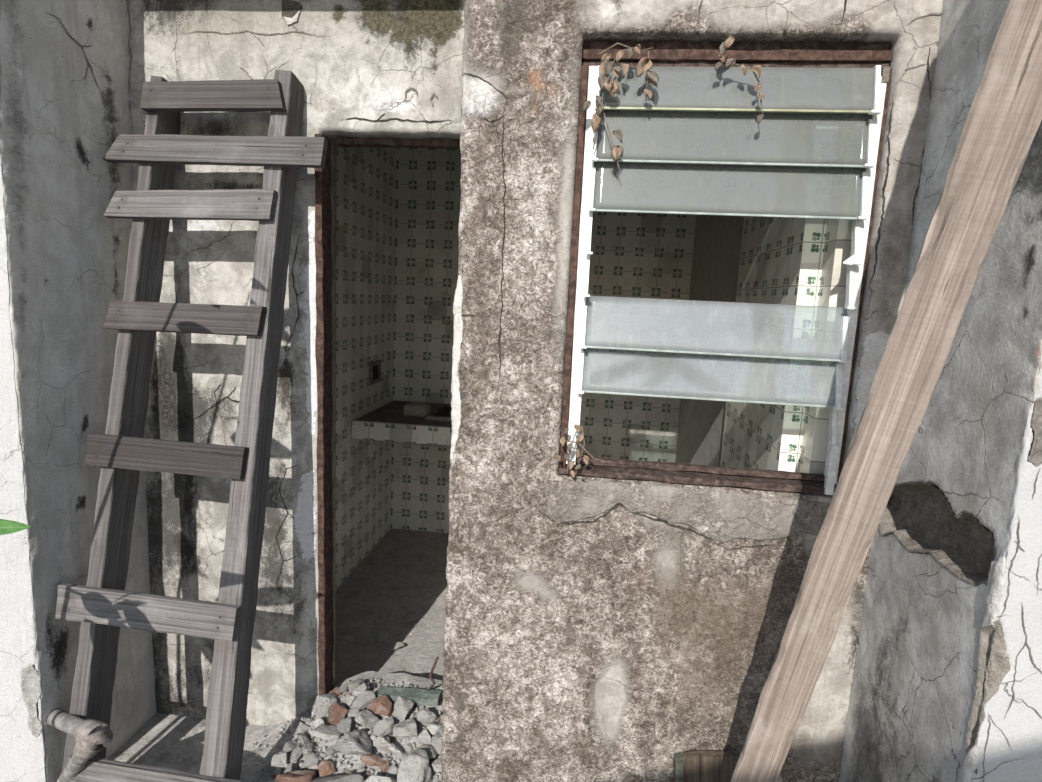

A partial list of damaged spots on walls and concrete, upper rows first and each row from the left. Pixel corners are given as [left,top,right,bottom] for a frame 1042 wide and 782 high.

crack [44,11,102,94]
spalling [282,0,303,26]
damp [332,4,345,21]
damp [359,0,464,70]
damp [1009,120,1042,201]
crack [342,73,508,390]
damp [151,346,190,438]
spalling [1028,398,1042,466]
damp [172,532,206,579]
crack [542,503,771,550]
spalling [879,482,1011,782]
crack [983,470,1042,782]